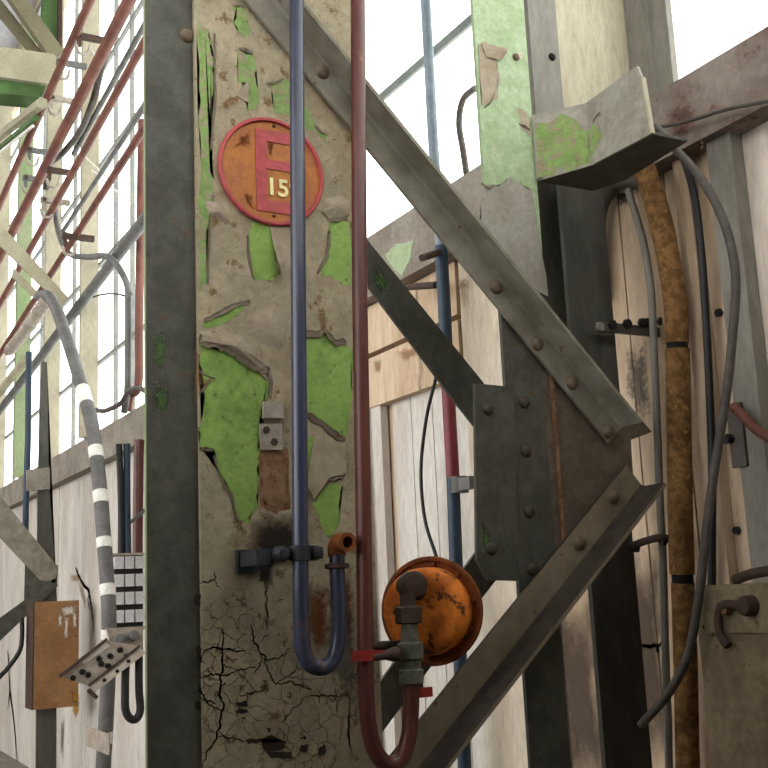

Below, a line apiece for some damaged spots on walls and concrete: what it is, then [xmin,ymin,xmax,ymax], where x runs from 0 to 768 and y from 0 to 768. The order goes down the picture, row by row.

peeling [478,42,508,108]
peeling [196,22,217,290]
peeling [518,107,602,177]
peeling [247,221,291,281]
peeling [316,210,352,286]
peeling [386,240,414,276]
peeling [195,300,274,525]
peeling [306,325,353,536]
crack [75,568,94,632]
crack [198,582,352,768]
corrosion [309,593,327,649]
crack [642,642,661,653]